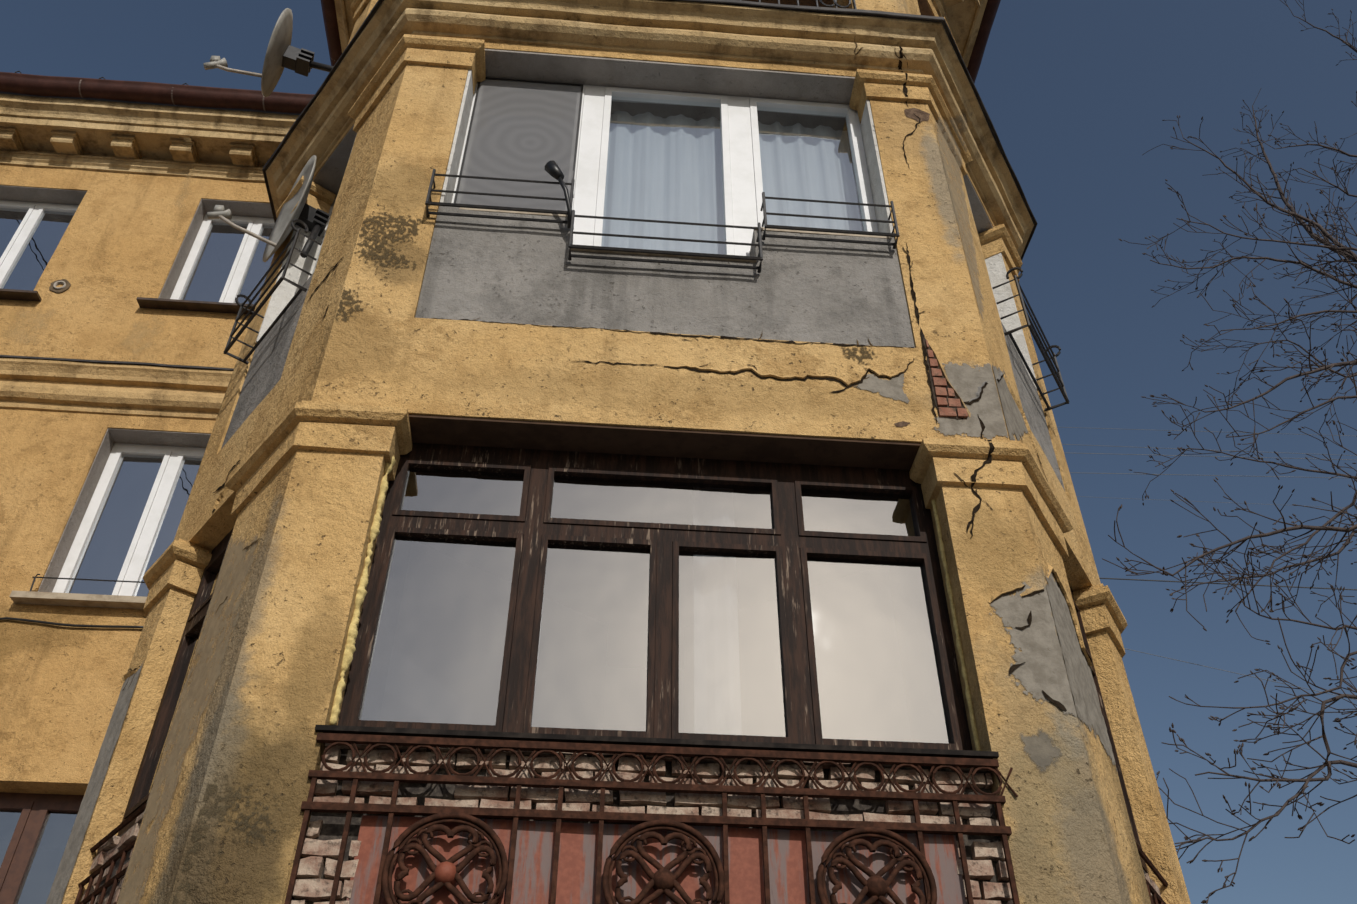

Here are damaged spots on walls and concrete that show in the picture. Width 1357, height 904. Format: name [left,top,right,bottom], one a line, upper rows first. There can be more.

crack [845,27,921,169]
flaking render [354,207,425,278]
crack [902,243,925,324]
crack [574,358,914,393]
flaking render [835,345,910,403]
crack [953,414,995,539]
flaking render [920,327,1029,441]
crack [999,366,1058,499]
flaking render [987,563,1118,772]